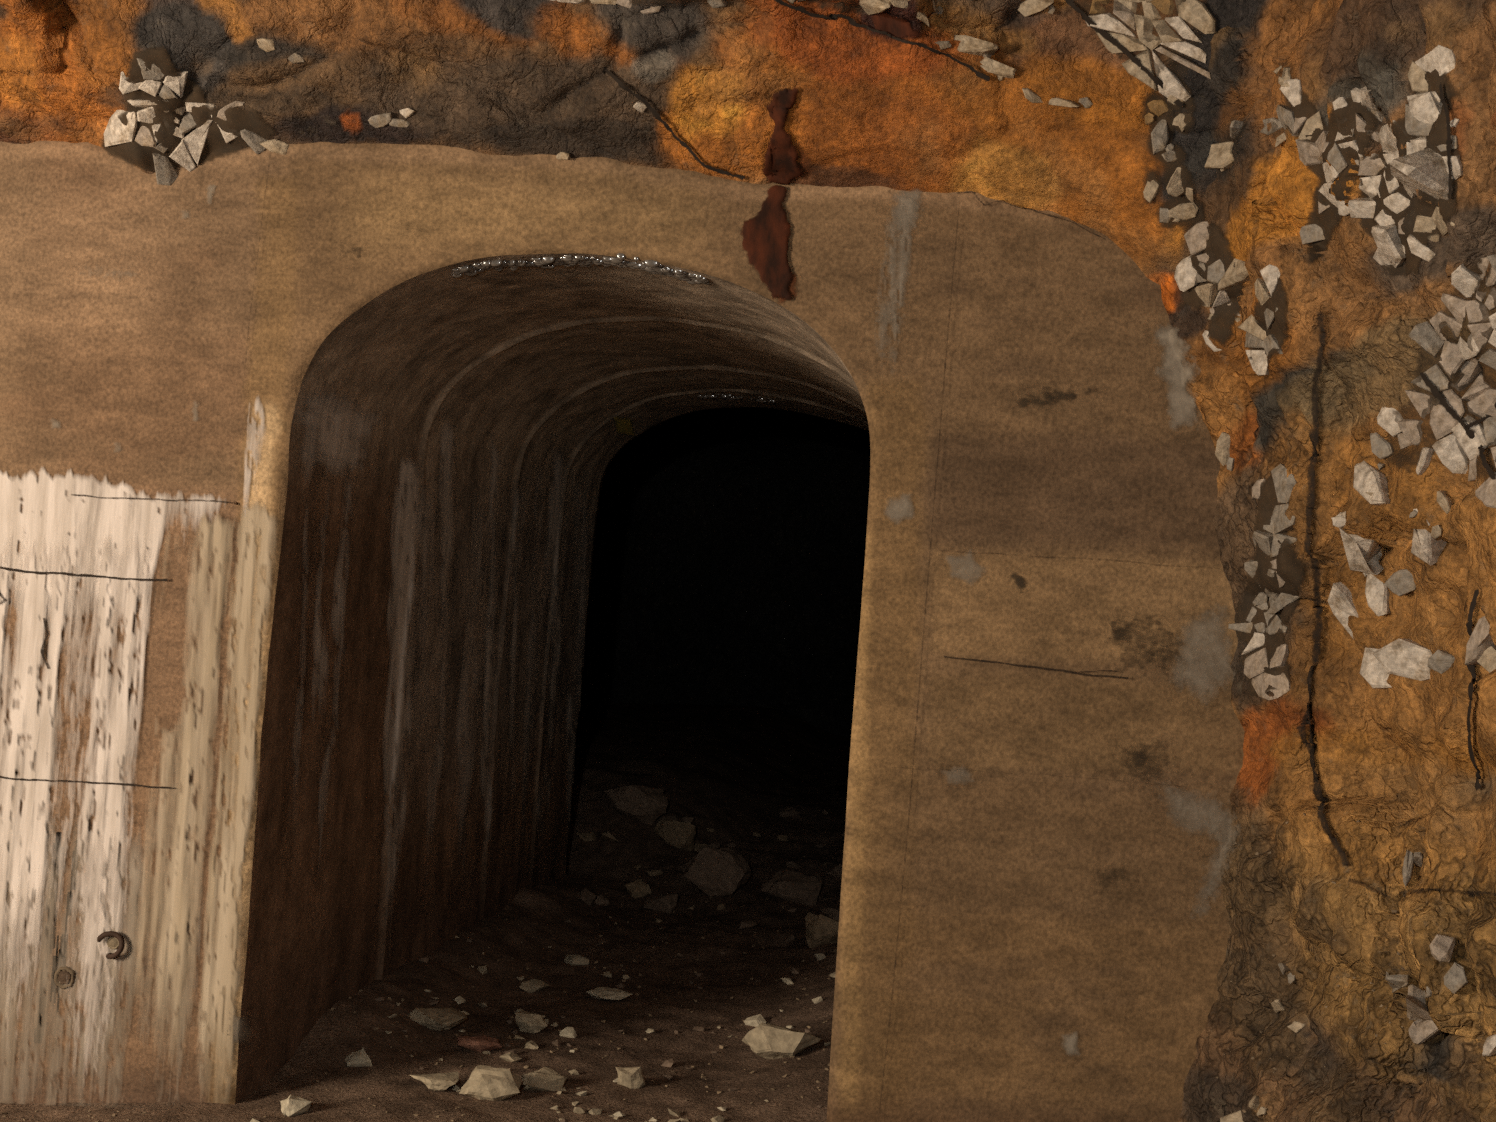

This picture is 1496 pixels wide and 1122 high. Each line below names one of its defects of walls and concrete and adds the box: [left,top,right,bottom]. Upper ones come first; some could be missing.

corrosion [740,87,809,302]
water stain [0,400,275,1100]